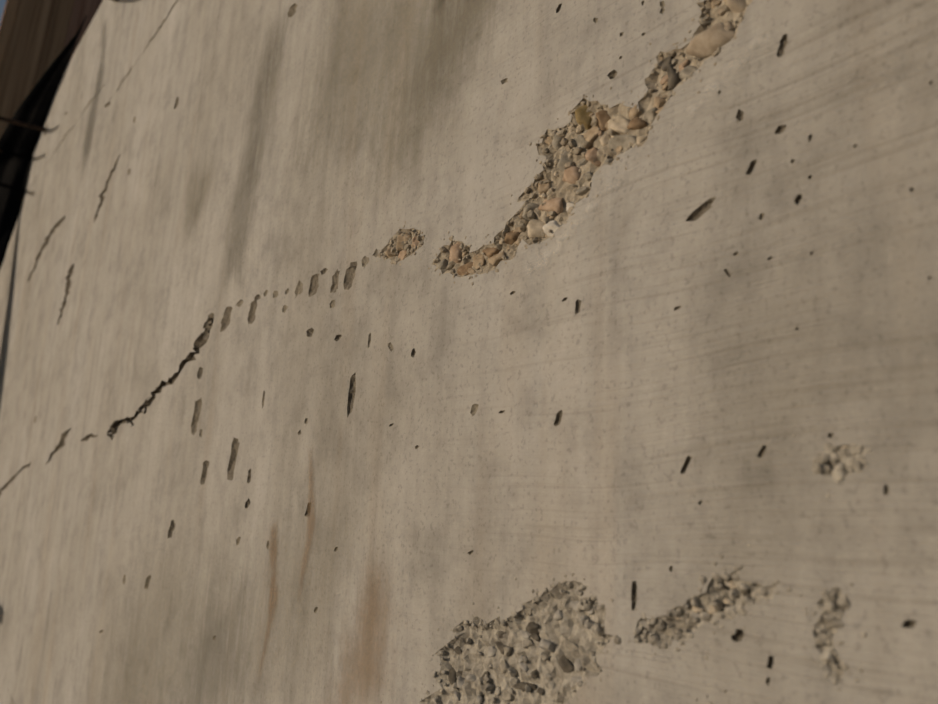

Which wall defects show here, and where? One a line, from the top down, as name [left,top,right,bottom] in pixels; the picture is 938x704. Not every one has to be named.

crack [0,318,213,496]